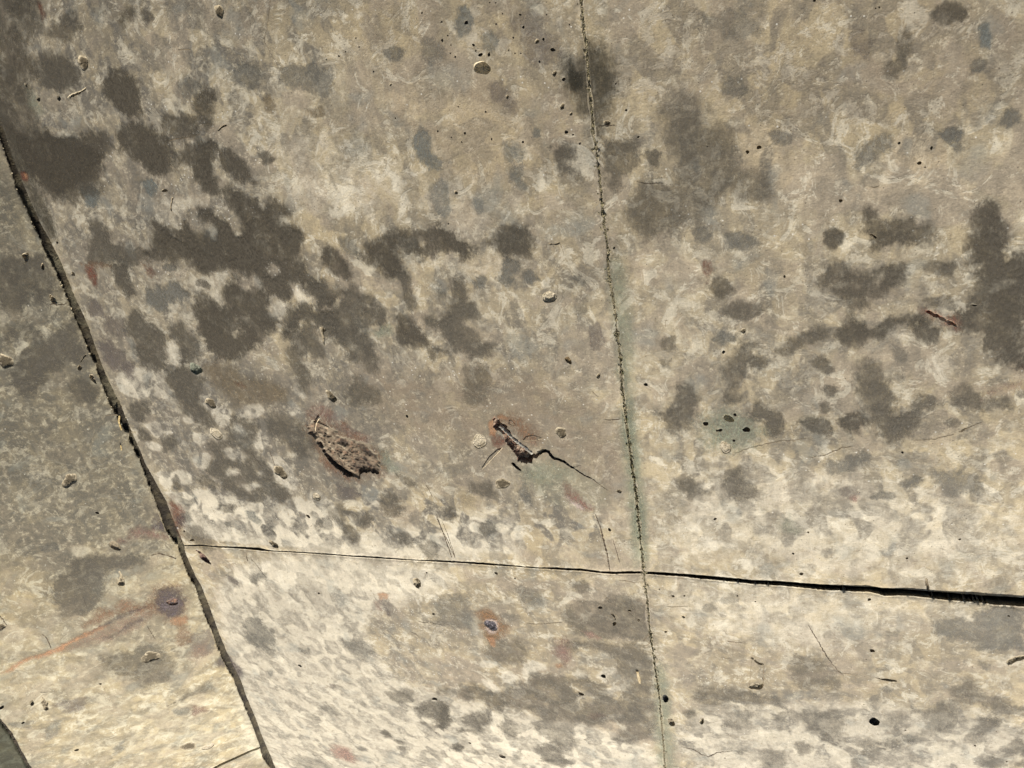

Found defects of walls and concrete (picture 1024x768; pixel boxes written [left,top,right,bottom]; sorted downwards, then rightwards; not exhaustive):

damp [604,143,659,181]
damp [0,0,490,519]
damp [824,229,844,250]
damp [779,264,940,354]
damp [866,208,917,250]
damp [933,263,955,277]
damp [957,203,1024,371]
damp [799,358,935,443]
spalling [307,417,381,479]
crack [511,450,607,490]
rust [10,588,187,670]
rust [478,610,507,645]